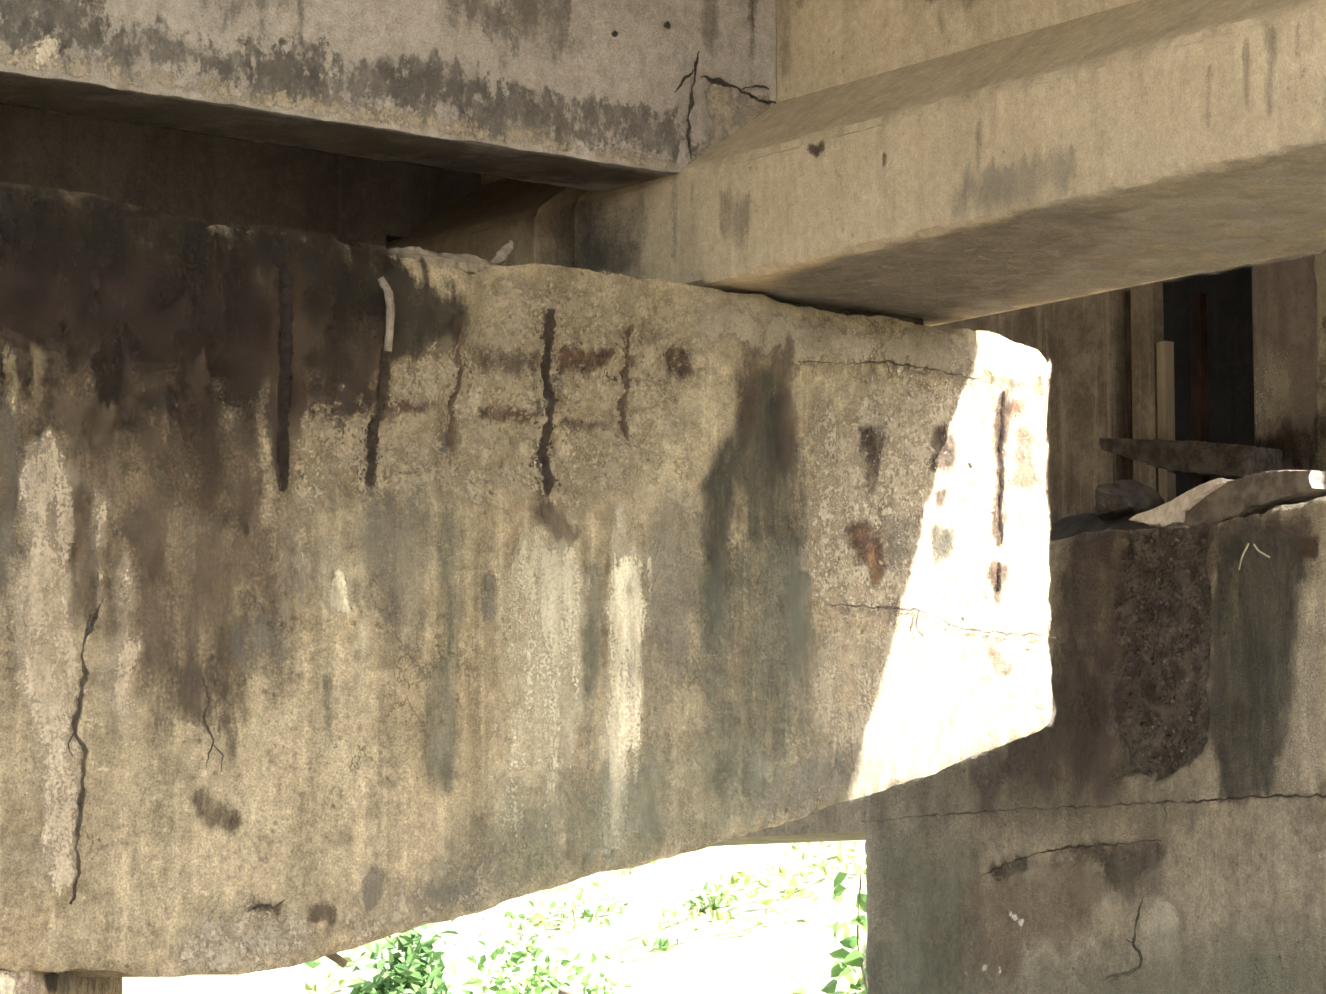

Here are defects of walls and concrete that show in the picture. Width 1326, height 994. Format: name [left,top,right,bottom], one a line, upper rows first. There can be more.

water stain [0,0,698,184]
crack [674,51,776,159]
water stain [561,200,638,277]
water stain [767,143,1326,320]
crack [68,597,104,905]
water stain [0,184,469,792]
rust [843,521,885,584]
water stain [482,335,1326,994]
crack [829,604,1056,640]
crack [862,793,1326,827]
spalling [1111,526,1211,781]
crack [1103,895,1144,980]